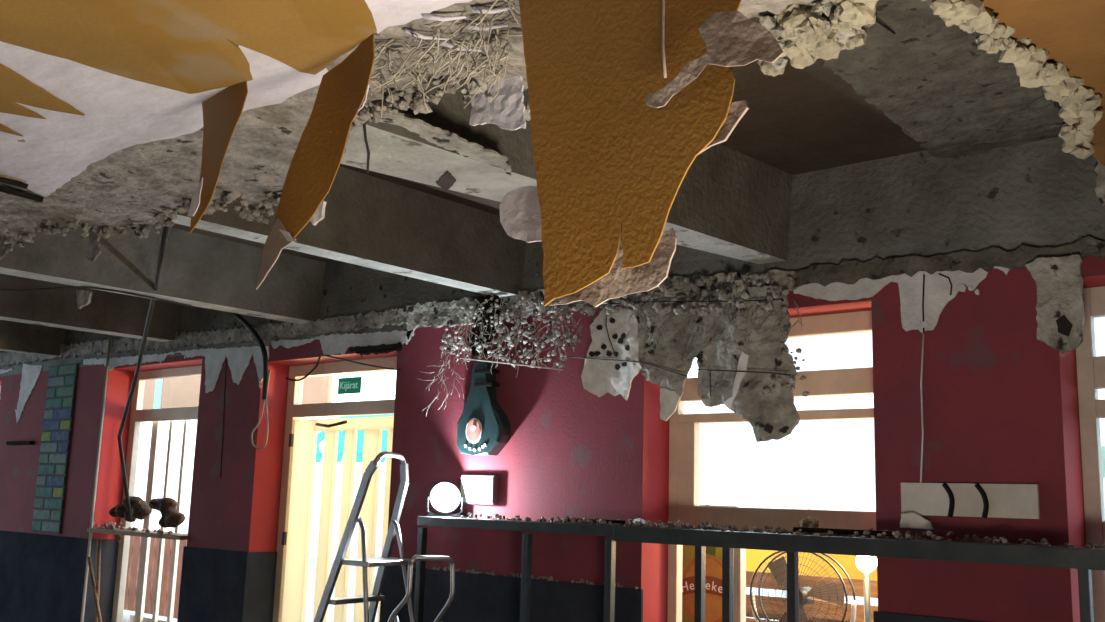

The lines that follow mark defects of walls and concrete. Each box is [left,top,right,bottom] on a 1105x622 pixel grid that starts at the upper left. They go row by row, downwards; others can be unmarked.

peeling [0,0,531,290]
flaking render [738,0,1064,158]
flaking render [1094,160,1105,208]
flaking render [0,289,586,424]
peeling [764,343,810,397]